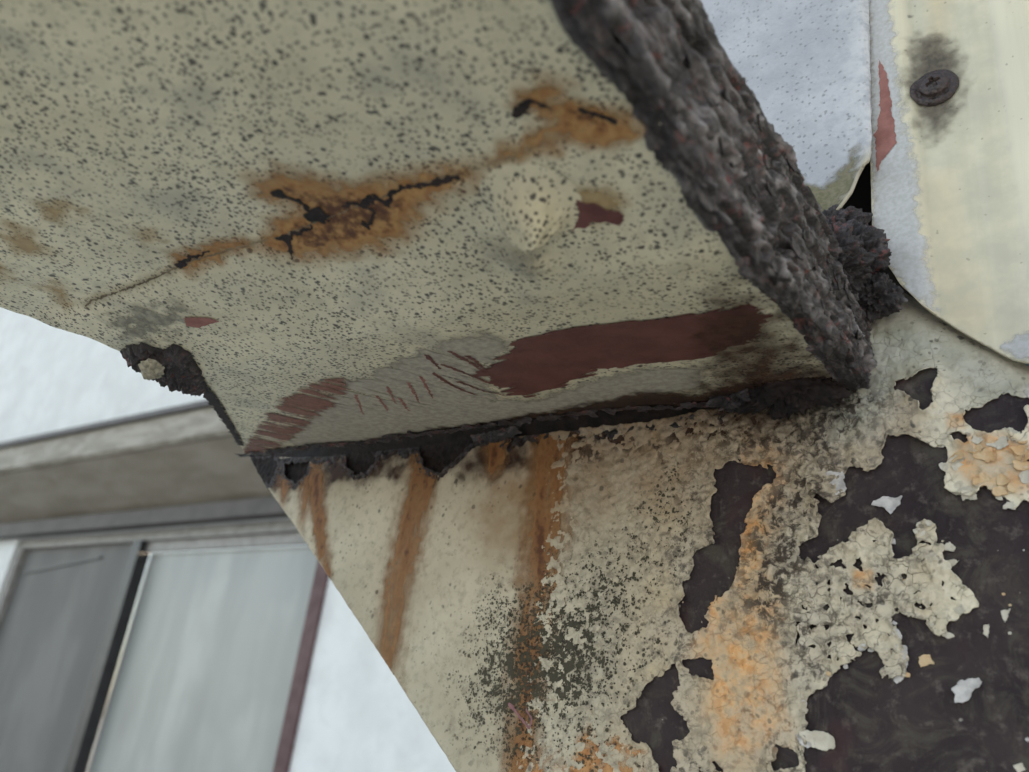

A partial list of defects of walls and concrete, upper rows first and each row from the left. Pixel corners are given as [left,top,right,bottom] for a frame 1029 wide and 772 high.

rust [498,86,643,160]
rust [171,239,249,271]
crack [85,123,593,307]
rust [253,165,469,260]
rust [579,190,619,211]
rust [822,204,908,323]
peeling [894,368,937,410]
rust [119,300,851,772]
damp [446,463,702,772]
peeling [678,459,776,634]
peeling [771,393,1029,772]